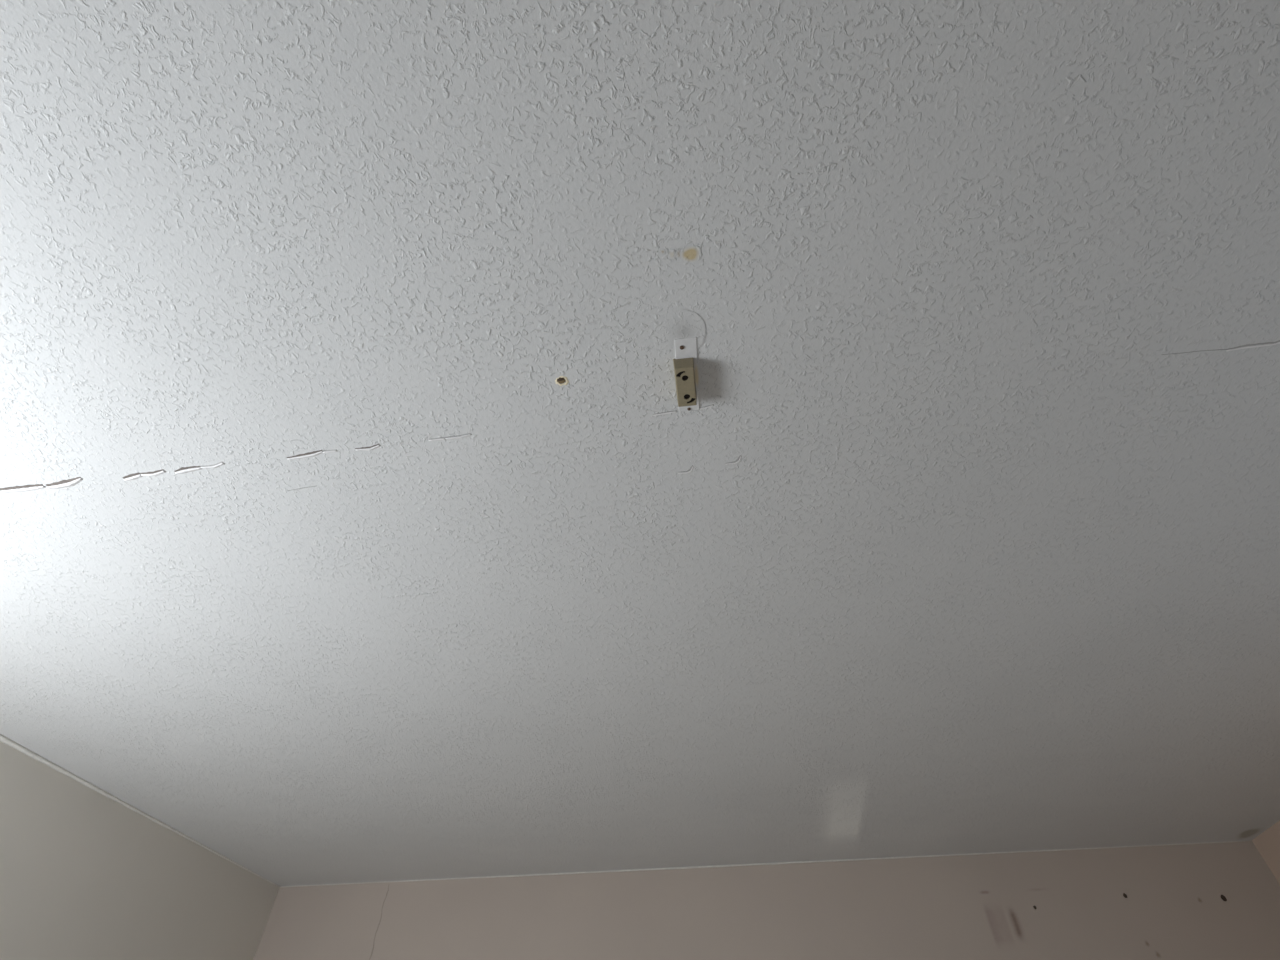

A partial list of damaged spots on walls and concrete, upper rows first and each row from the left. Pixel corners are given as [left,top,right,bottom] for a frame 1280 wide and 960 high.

crack [1162,340,1280,355]
crack [122,462,224,481]
crack [287,444,380,491]
crack [0,477,83,493]